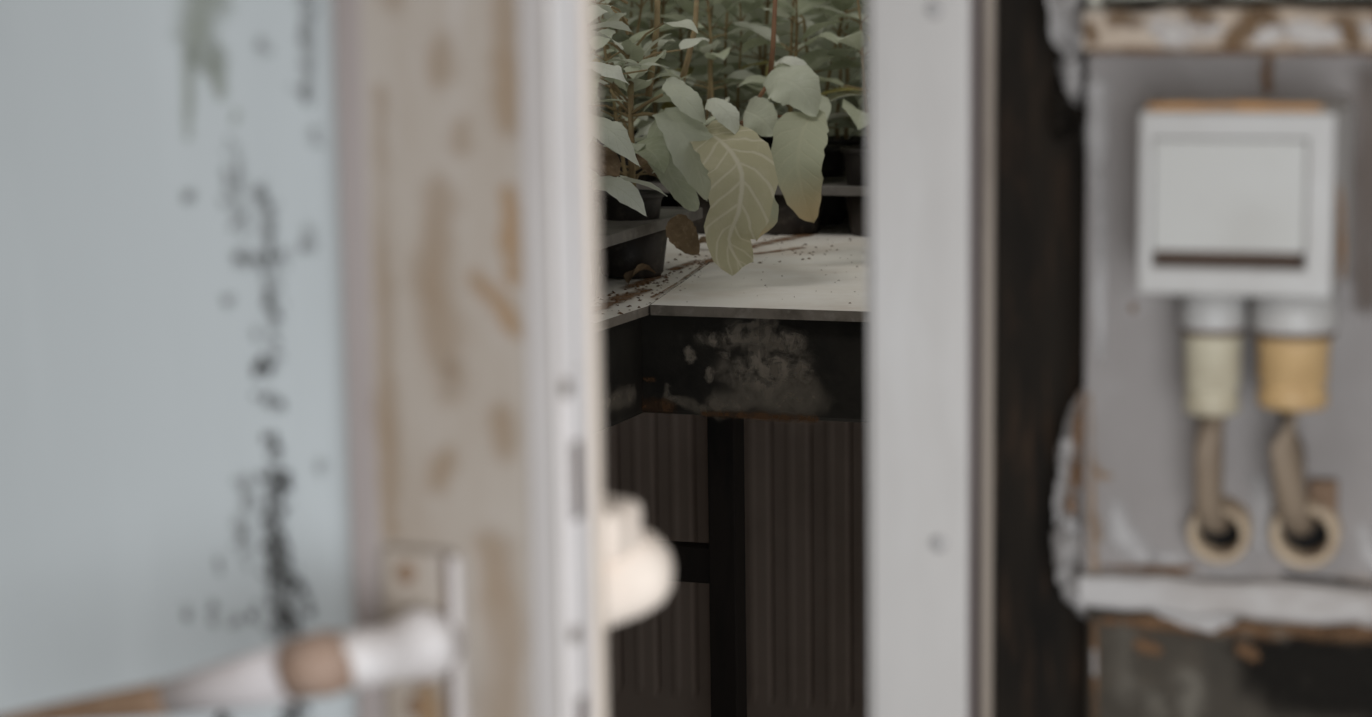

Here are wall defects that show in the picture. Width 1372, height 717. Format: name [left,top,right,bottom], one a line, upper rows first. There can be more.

water stain [246,432,314,640]
spalling [1051,386,1088,620]
spalling [1151,610,1238,633]